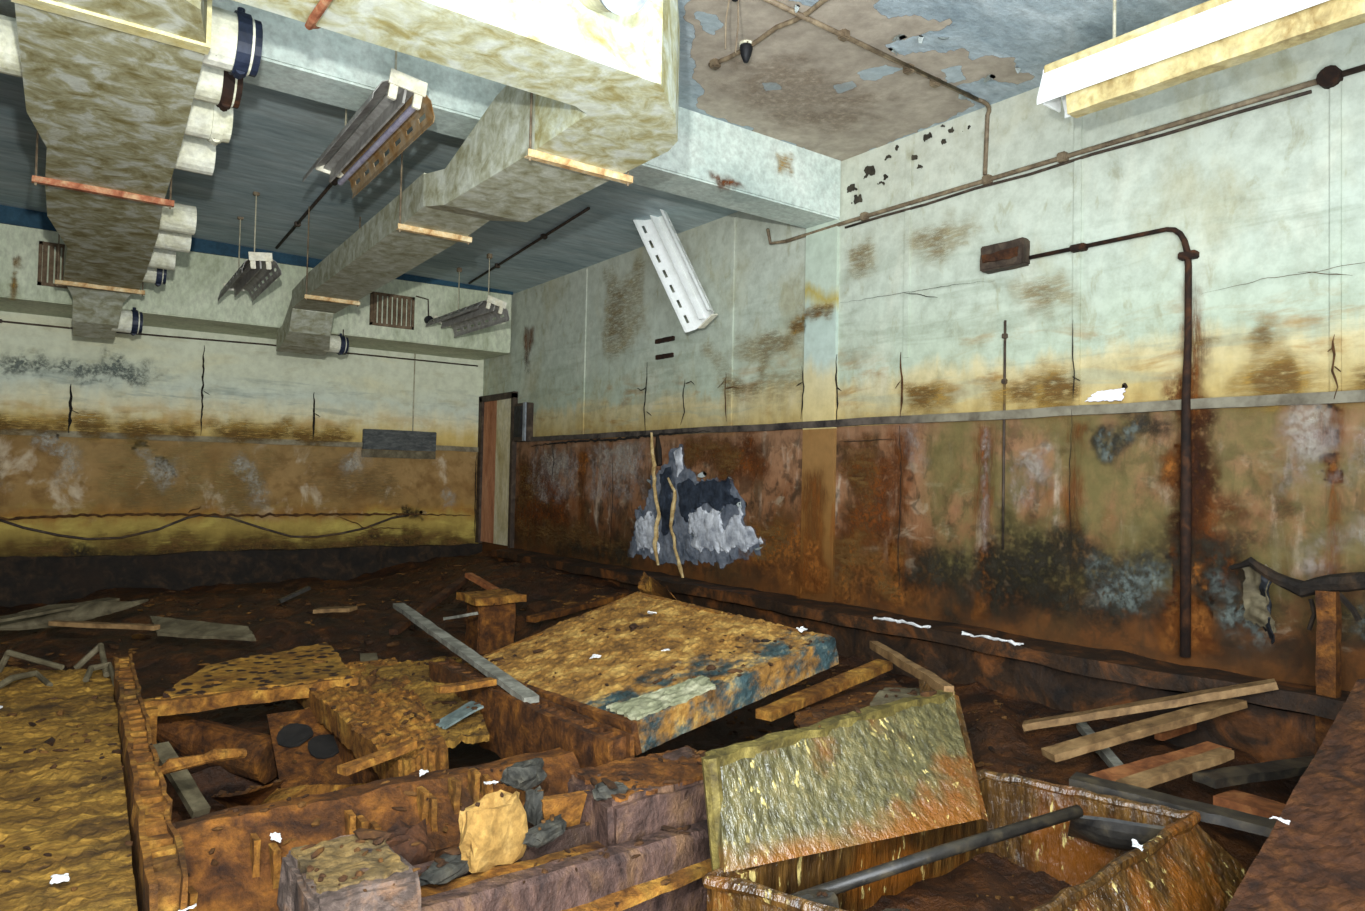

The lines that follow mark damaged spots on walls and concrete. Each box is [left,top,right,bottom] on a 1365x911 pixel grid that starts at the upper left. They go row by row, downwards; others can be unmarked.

peeling [683,0,1035,204]
leakage [12,360,144,381]
leakage [0,411,195,438]
leakage [220,419,349,444]
leakage [992,370,1076,408]
leakage [1234,328,1312,407]
flaking render [627,432,766,578]
rust [1161,315,1240,651]
rust [751,522,801,585]
rust [833,533,918,606]
leakage [873,617,931,628]
leakage [905,529,1262,646]